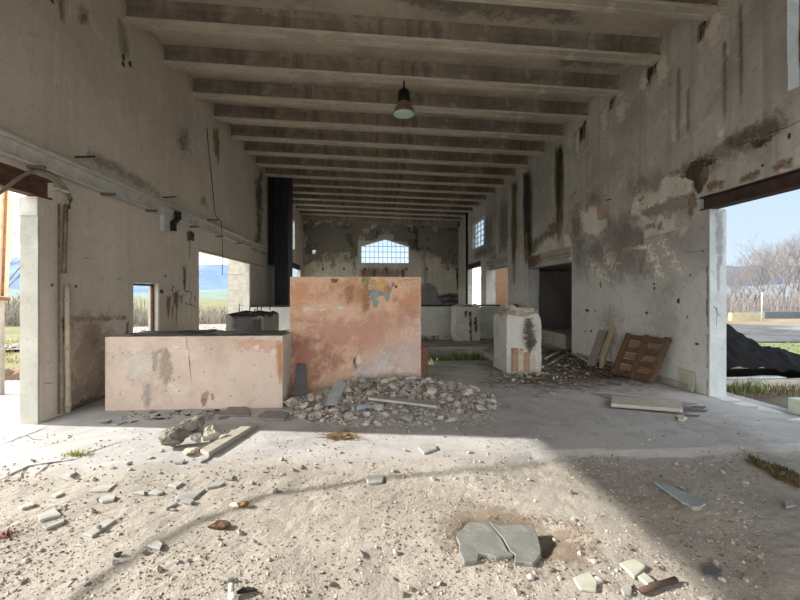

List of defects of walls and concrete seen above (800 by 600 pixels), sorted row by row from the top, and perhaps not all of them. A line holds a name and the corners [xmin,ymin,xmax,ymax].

damp [674,120,786,181]
damp [474,144,581,282]
peeling [630,159,715,239]
damp [172,265,187,323]
peeling [369,284,397,308]
damp [153,349,172,385]
damp [481,318,641,391]